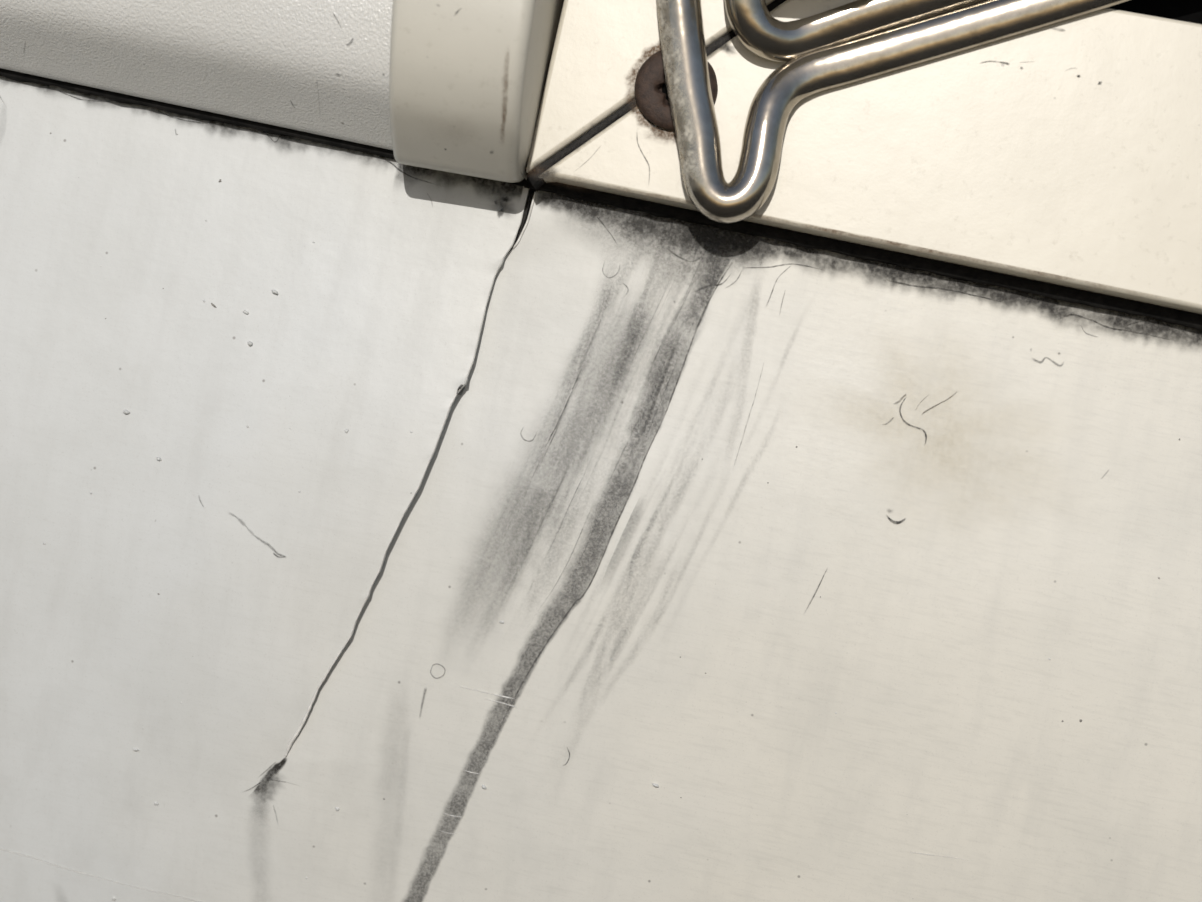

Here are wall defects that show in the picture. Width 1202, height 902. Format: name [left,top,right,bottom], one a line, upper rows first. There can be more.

crack [249,189,537,792]
leakage [692,260,726,317]